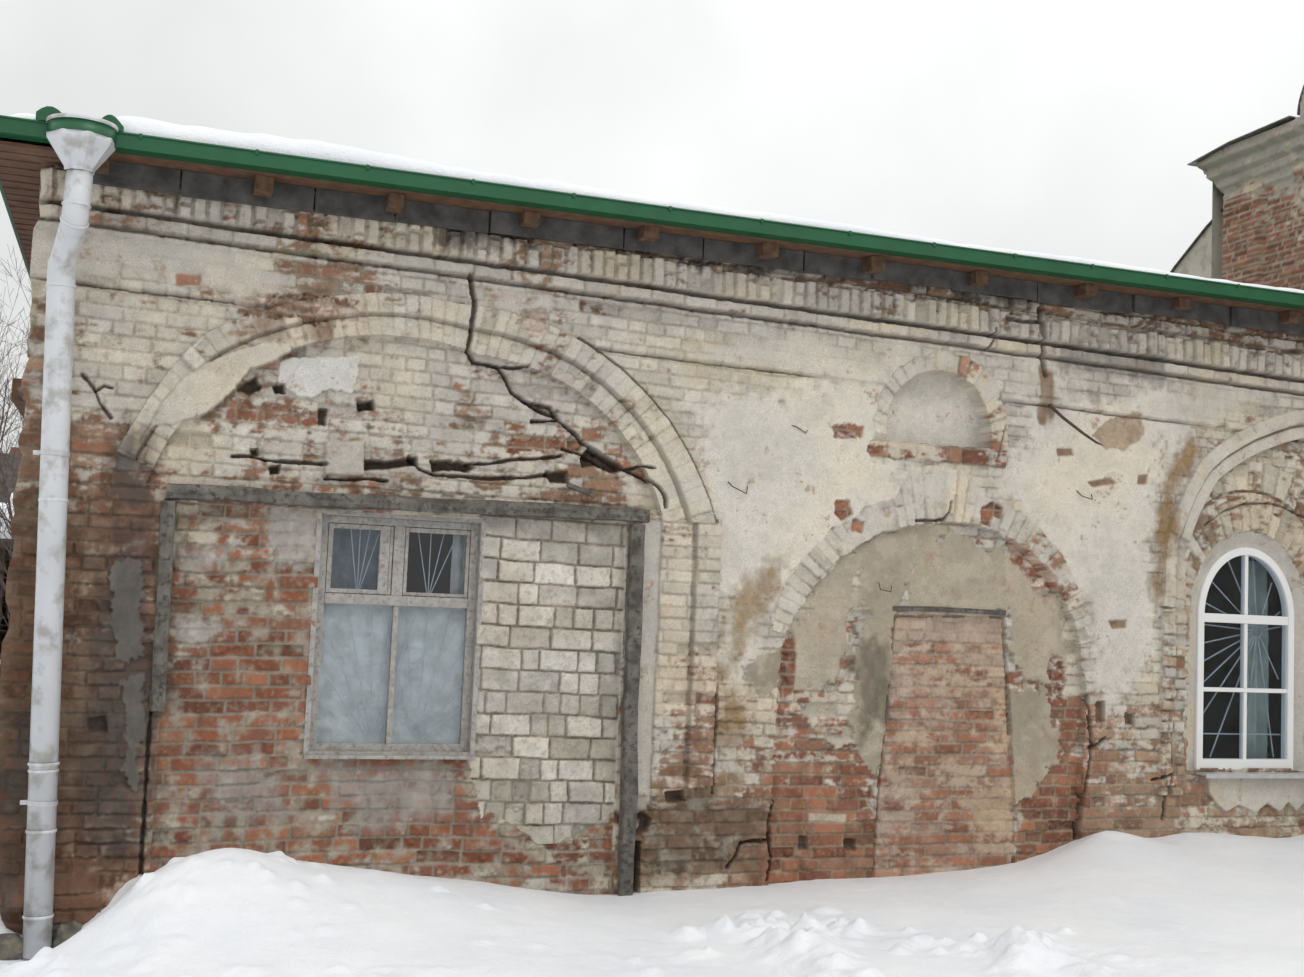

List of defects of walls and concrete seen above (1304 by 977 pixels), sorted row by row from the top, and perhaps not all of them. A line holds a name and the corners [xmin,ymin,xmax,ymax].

peeling [226,353,362,430]
crack [230,269,670,510]
spalling [429,458,477,473]
flaking render [506,432,617,484]
peeling [832,422,884,455]
peeling [1092,410,1146,451]
spalling [1005,538,1064,598]
water stain [735,568,775,650]
spalling [778,634,798,699]
spalling [1047,653,1068,700]
peeling [87,671,150,797]
spalling [664,789,686,803]